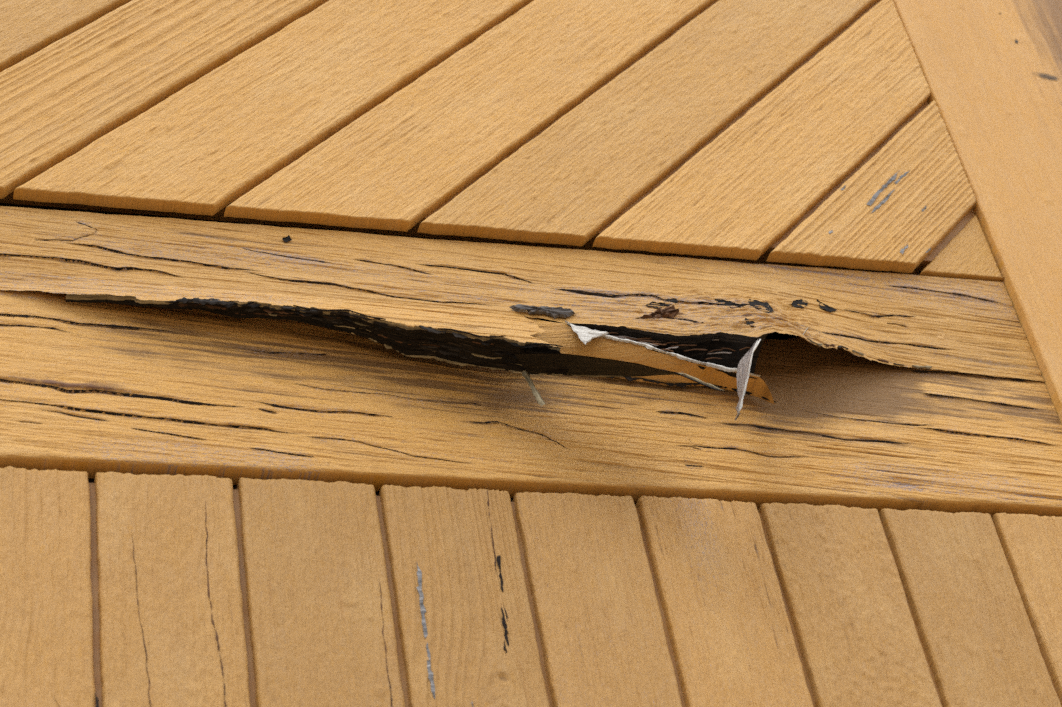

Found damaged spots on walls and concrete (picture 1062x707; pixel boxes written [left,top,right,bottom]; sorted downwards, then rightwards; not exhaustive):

crack [0,314,188,335]
crack [237,347,326,355]
spalling [559,322,768,379]
crack [0,376,568,463]
peeling [417,564,435,699]